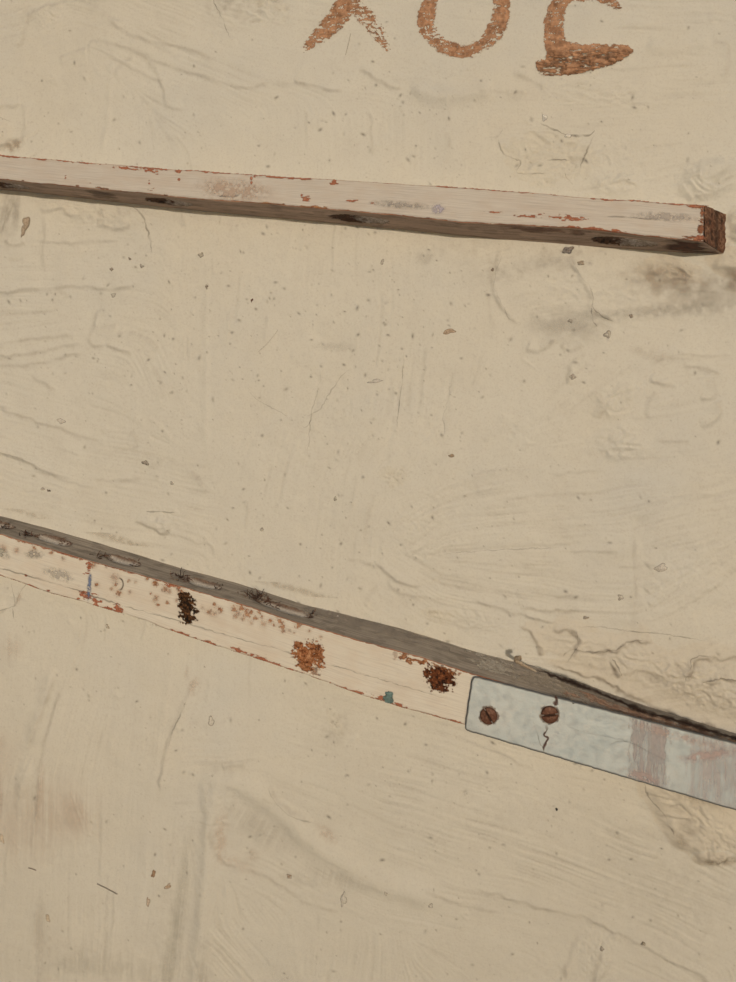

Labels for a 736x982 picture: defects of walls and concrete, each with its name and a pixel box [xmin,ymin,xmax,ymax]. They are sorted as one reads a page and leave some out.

corrosion [146,578,285,632]
corrosion [291,623,326,673]
corrosion [398,653,461,693]